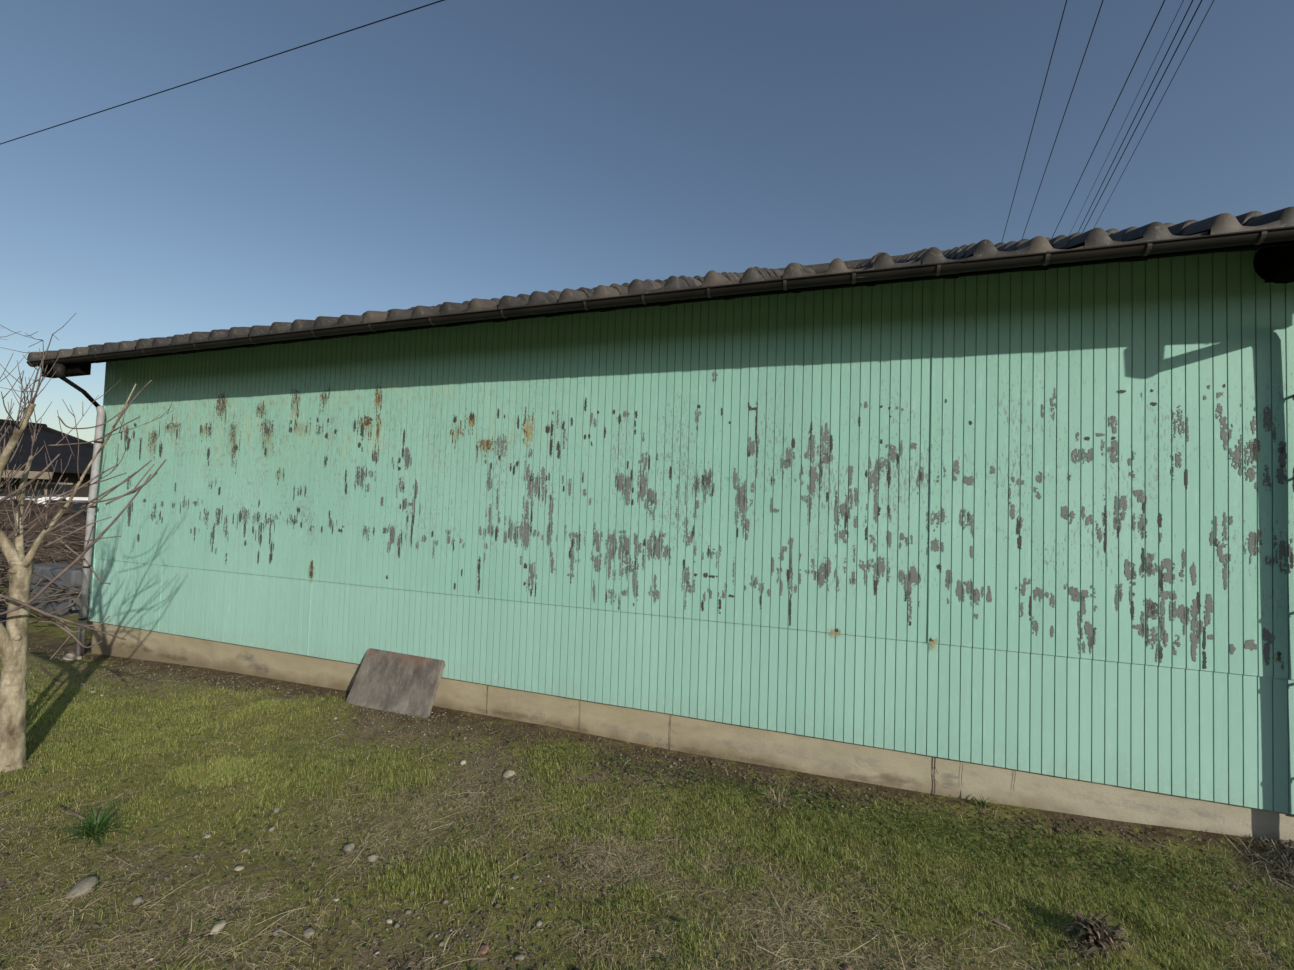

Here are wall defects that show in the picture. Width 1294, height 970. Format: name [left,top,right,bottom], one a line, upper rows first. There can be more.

rust [357,383,382,457]
rust [450,409,496,464]
rust [523,407,534,443]
peeling [1041,388,1056,421]
peeling [1204,384,1294,492]
peeling [127,479,343,564]
peeling [345,420,465,558]
peeling [454,398,992,626]
peeling [1009,471,1043,549]
peeling [1061,405,1294,671]
peeling [1016,577,1098,654]